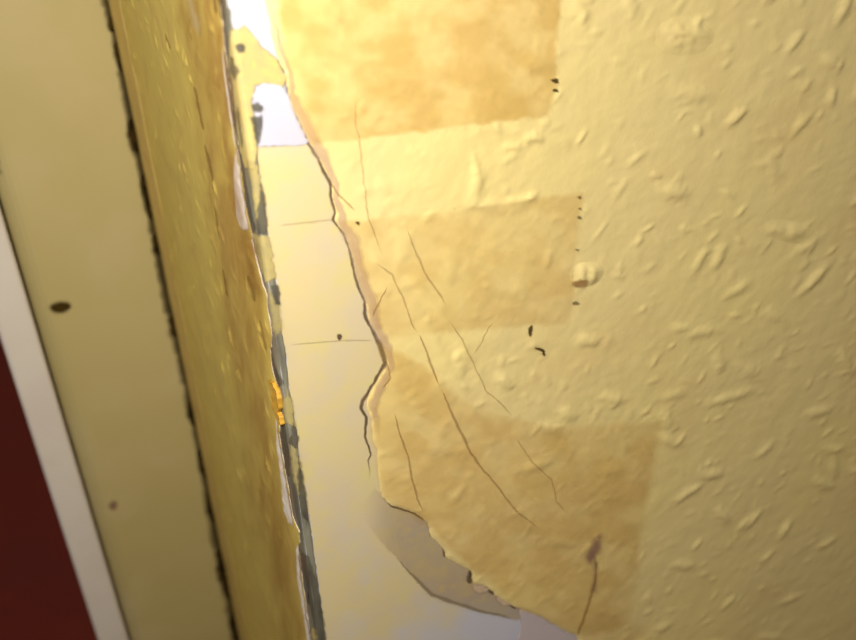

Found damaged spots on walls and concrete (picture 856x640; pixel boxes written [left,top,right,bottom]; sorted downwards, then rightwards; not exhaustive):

peeling [230,44,245,79]
flaking render [226,0,279,60]
flaking render [251,83,308,147]
peeling [239,153,267,234]
peeling [271,285,280,304]
peeling [280,424,308,520]
peeling [301,554,325,640]
crack [578,558,597,633]